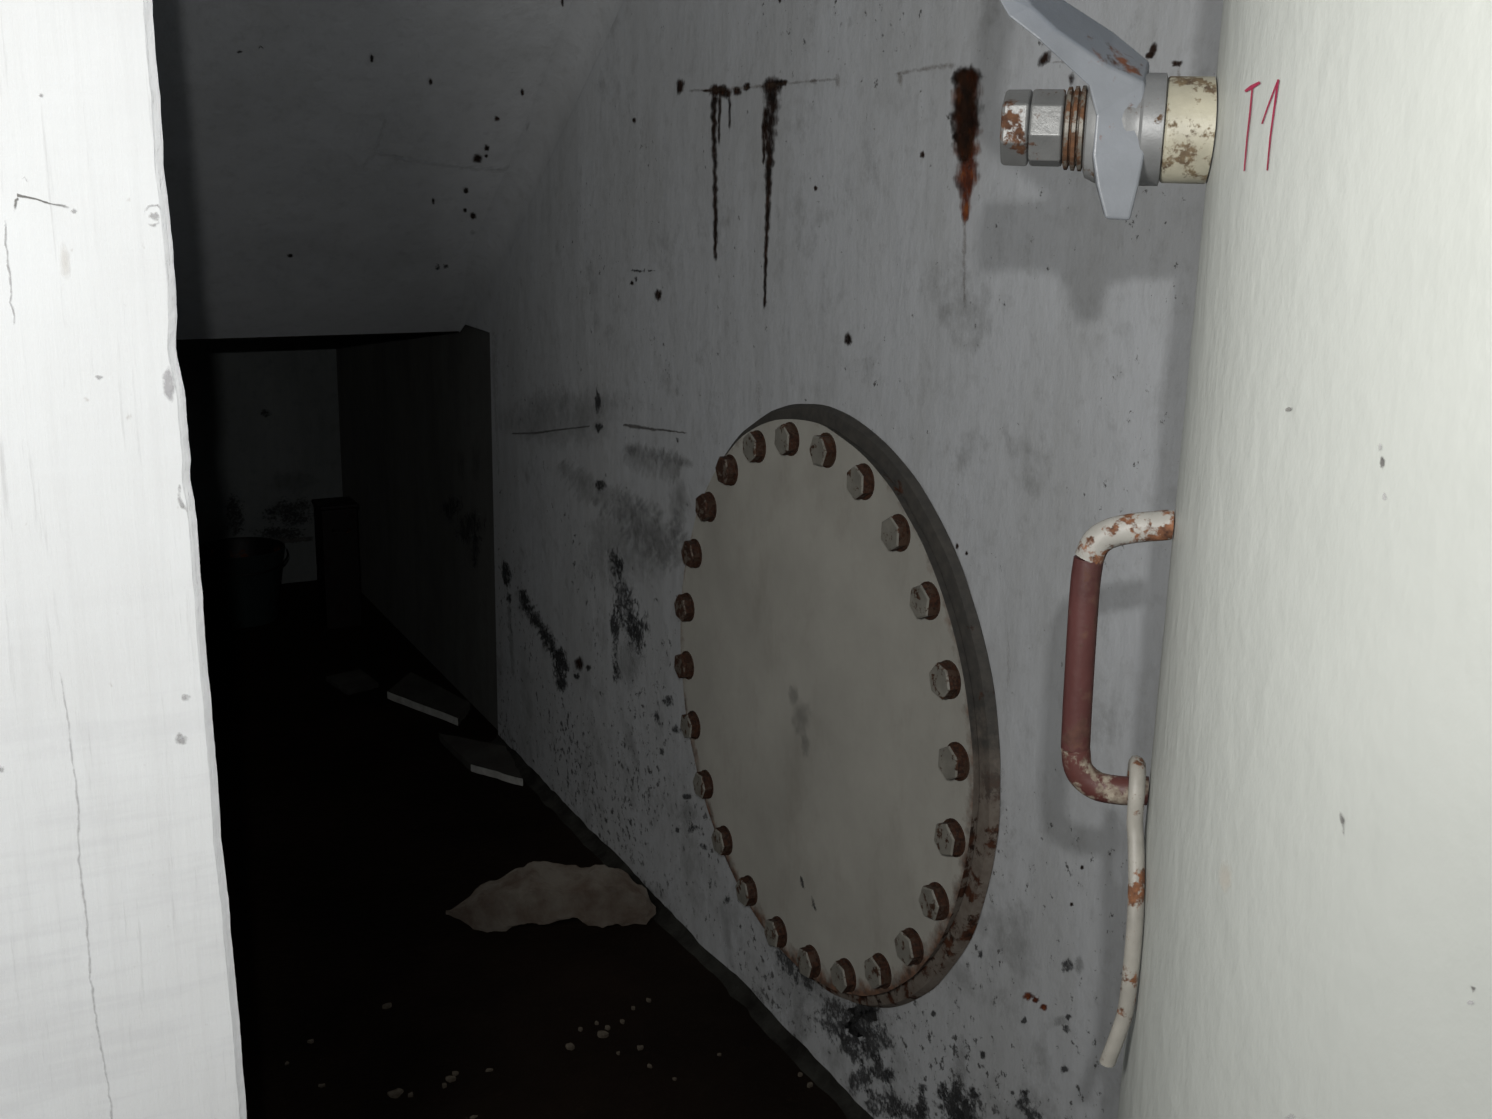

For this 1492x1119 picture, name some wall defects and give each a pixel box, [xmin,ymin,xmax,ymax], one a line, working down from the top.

corrosion [703,78,787,307]
corrosion [951,66,981,221]
water stain [595,392,603,433]
mould [501,560,591,692]
mould [608,549,648,681]
mould [776,950,981,1119]
mould [1011,1090,1042,1119]